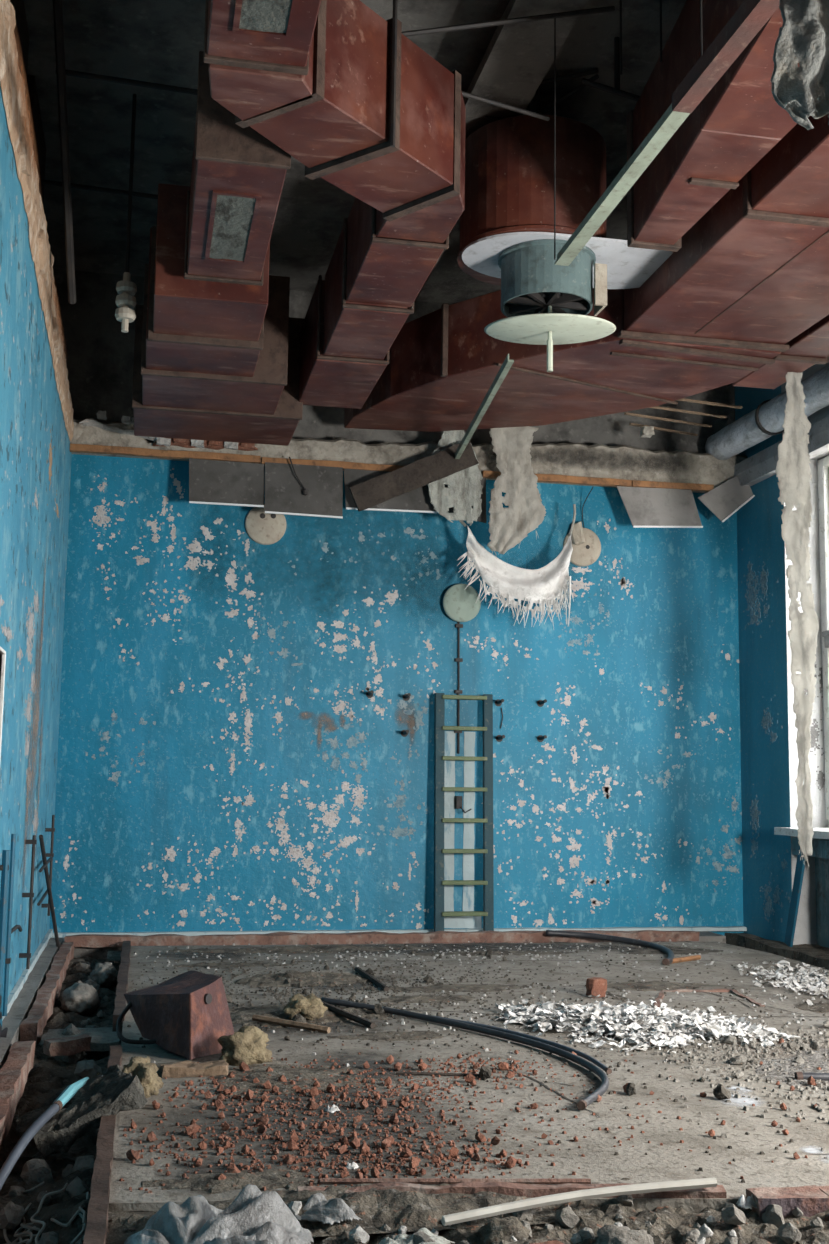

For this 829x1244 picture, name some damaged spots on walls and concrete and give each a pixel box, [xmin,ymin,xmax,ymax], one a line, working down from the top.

flaking render [0,0,258,518]
peeling [0,581,42,835]
peeling [54,836,95,930]
peeling [86,468,446,931]
peeling [464,630,539,679]
peeling [558,556,634,682]
peeling [493,679,731,928]
peeling [678,782,791,932]